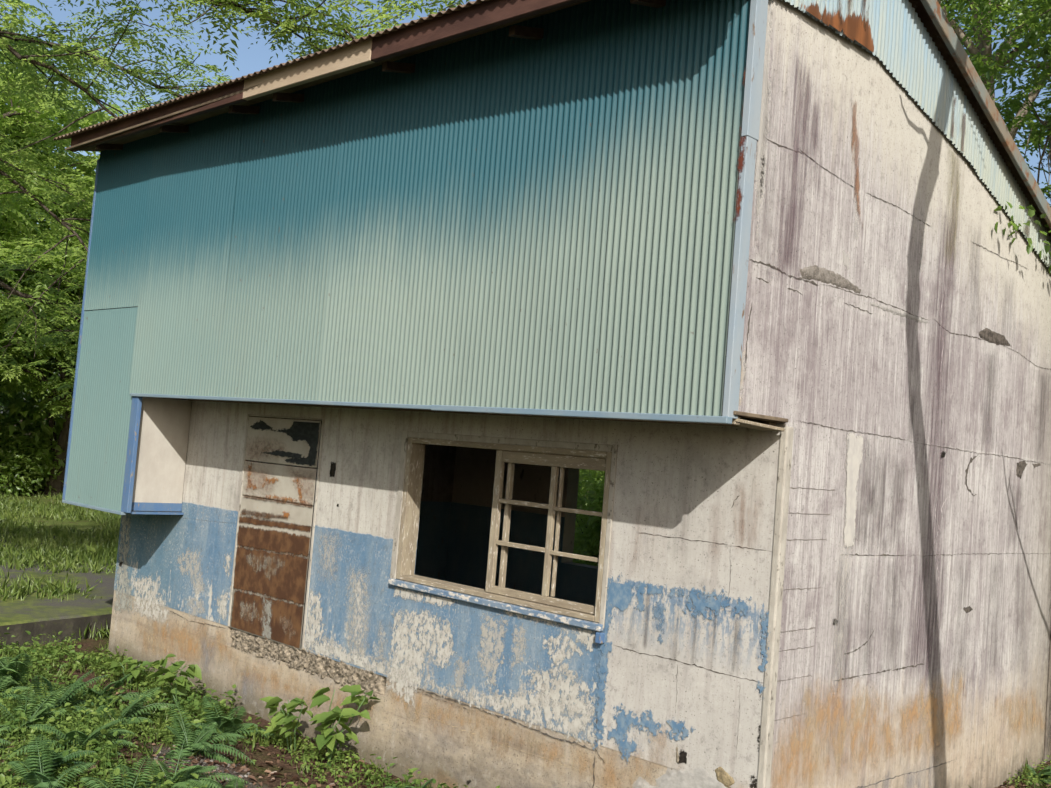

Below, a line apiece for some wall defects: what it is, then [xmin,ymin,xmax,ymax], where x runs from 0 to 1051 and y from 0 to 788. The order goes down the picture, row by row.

corrosion [799,0,876,54]
corrosion [735,113,747,220]
water stain [780,94,806,259]
corrosion [852,107,860,214]
water stain [951,98,966,151]
peeling [250,420,320,467]
peeling [114,514,169,626]
corrosion [231,463,312,648]
peeling [178,547,769,788]
water stain [779,679,962,782]